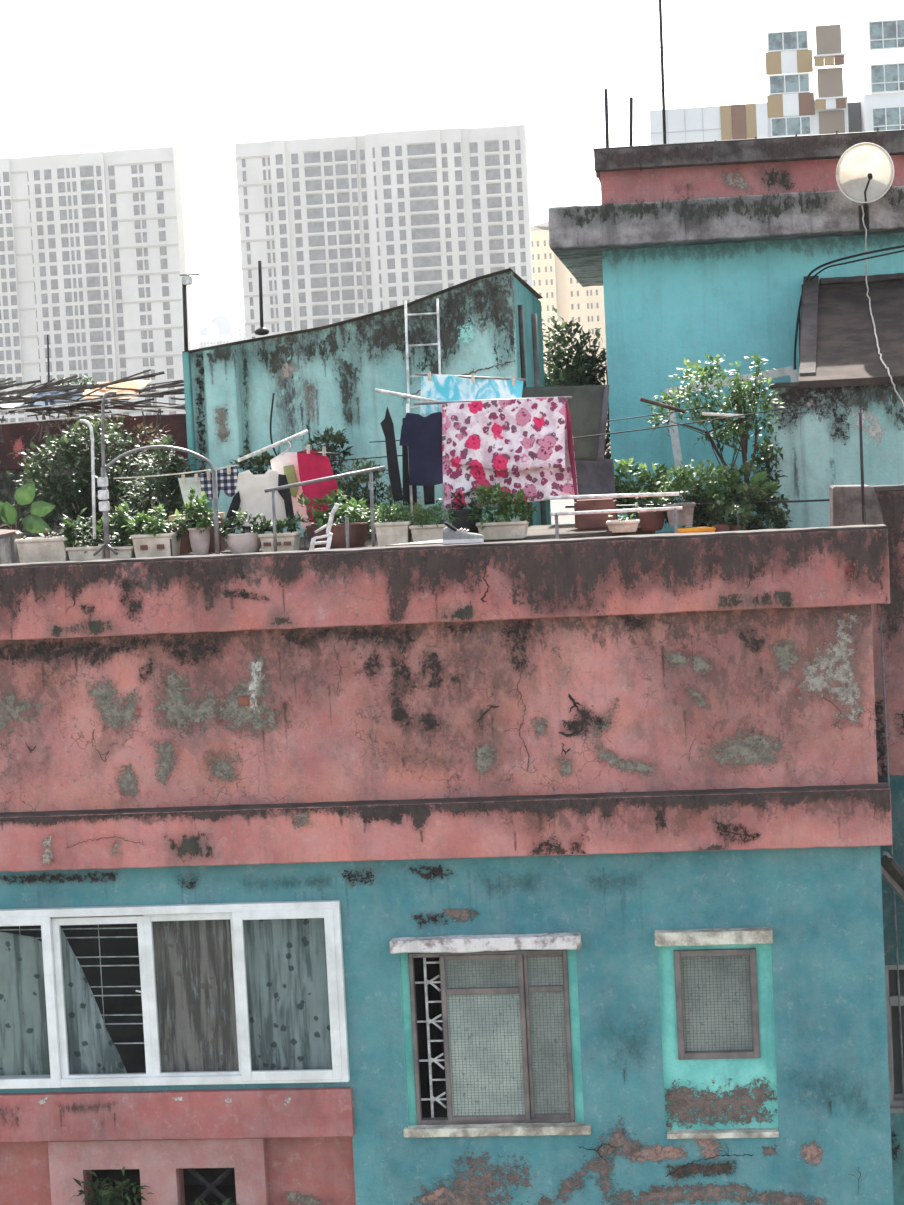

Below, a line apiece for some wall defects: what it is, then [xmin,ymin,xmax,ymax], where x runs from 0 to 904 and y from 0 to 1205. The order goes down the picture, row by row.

water stain [555,134,884,227]
water stain [884,186,904,212]
water stain [194,273,519,485]
peeling [85,645,291,798]
water stain [0,491,904,733]
peeling [699,726,792,774]
peeling [770,610,869,728]
peeling [443,907,480,923]
flaking render [406,1077,827,1205]